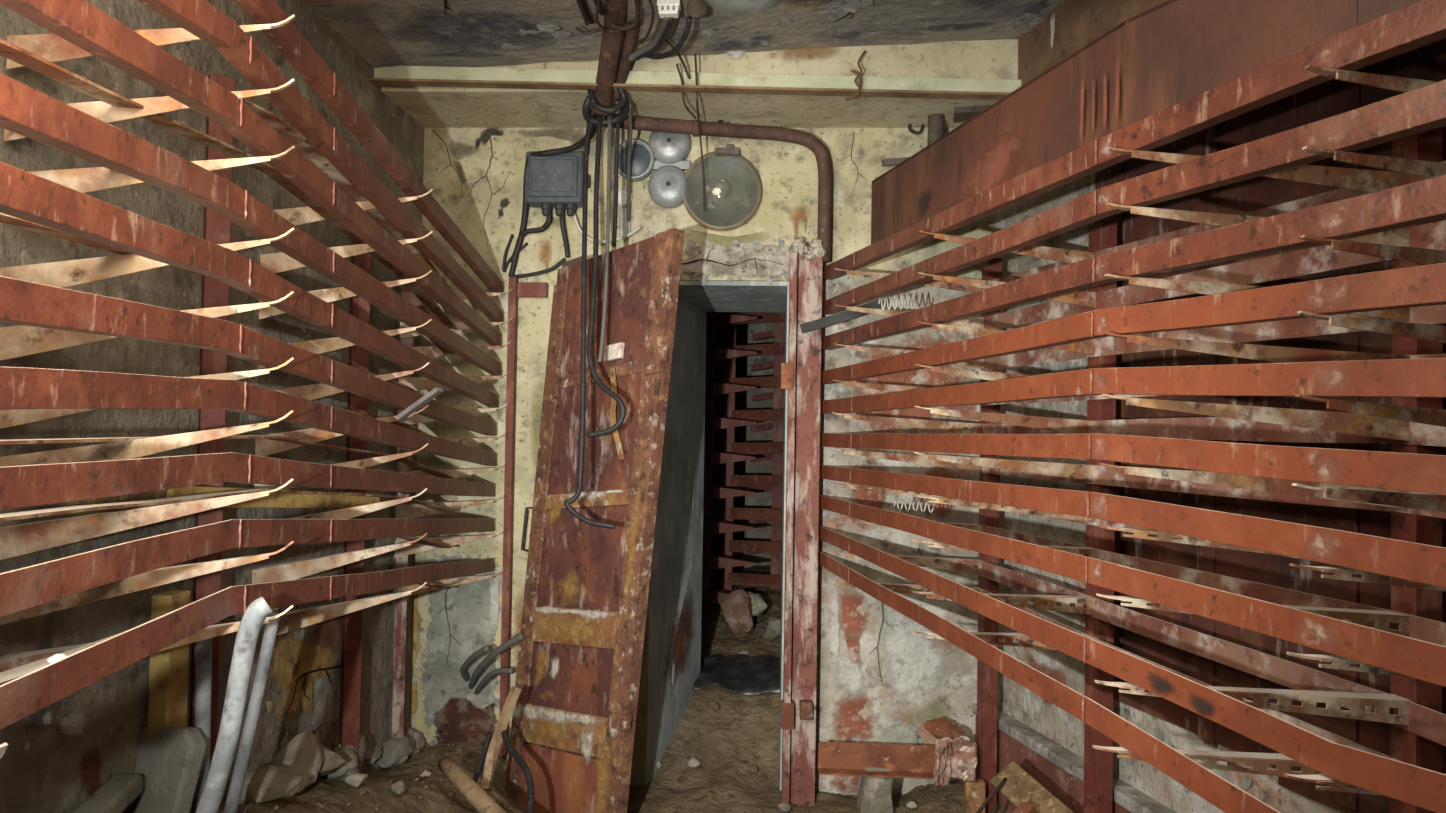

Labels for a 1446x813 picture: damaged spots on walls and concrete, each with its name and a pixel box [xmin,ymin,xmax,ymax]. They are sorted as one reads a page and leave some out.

crack [432,130,509,246]
spalling [766,237,827,285]